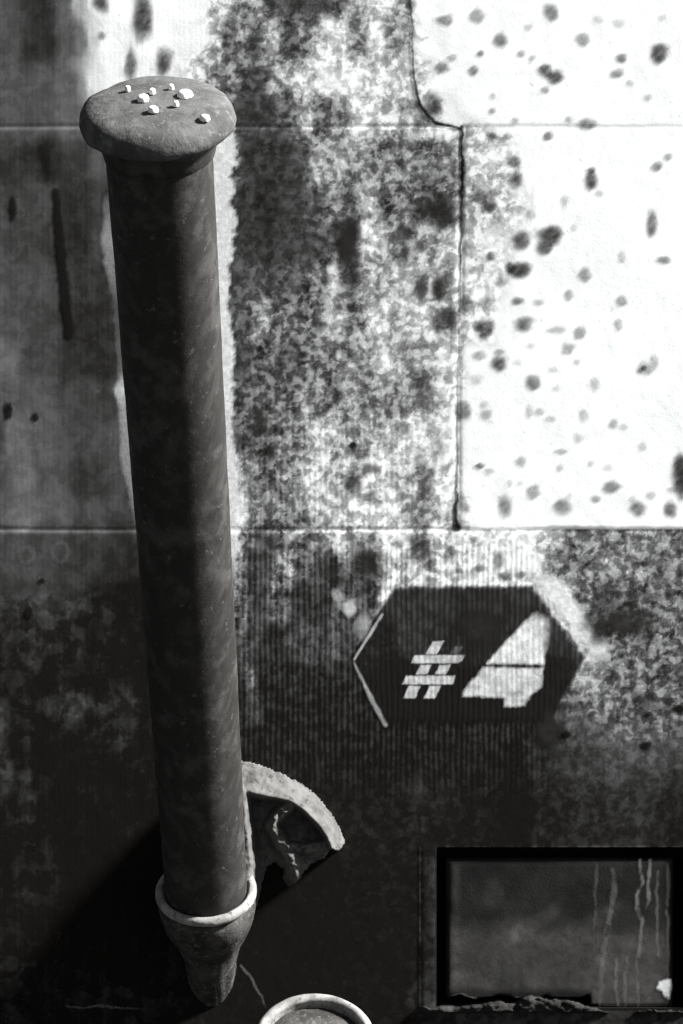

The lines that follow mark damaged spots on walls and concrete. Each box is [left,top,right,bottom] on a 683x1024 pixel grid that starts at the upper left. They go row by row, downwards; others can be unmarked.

crack [408,0,464,270]
water stain [53,188,74,339]
water stain [340,221,360,283]
water stain [213,133,247,571]
water stain [256,411,267,431]
crack [453,451,461,525]
water stain [535,530,683,847]